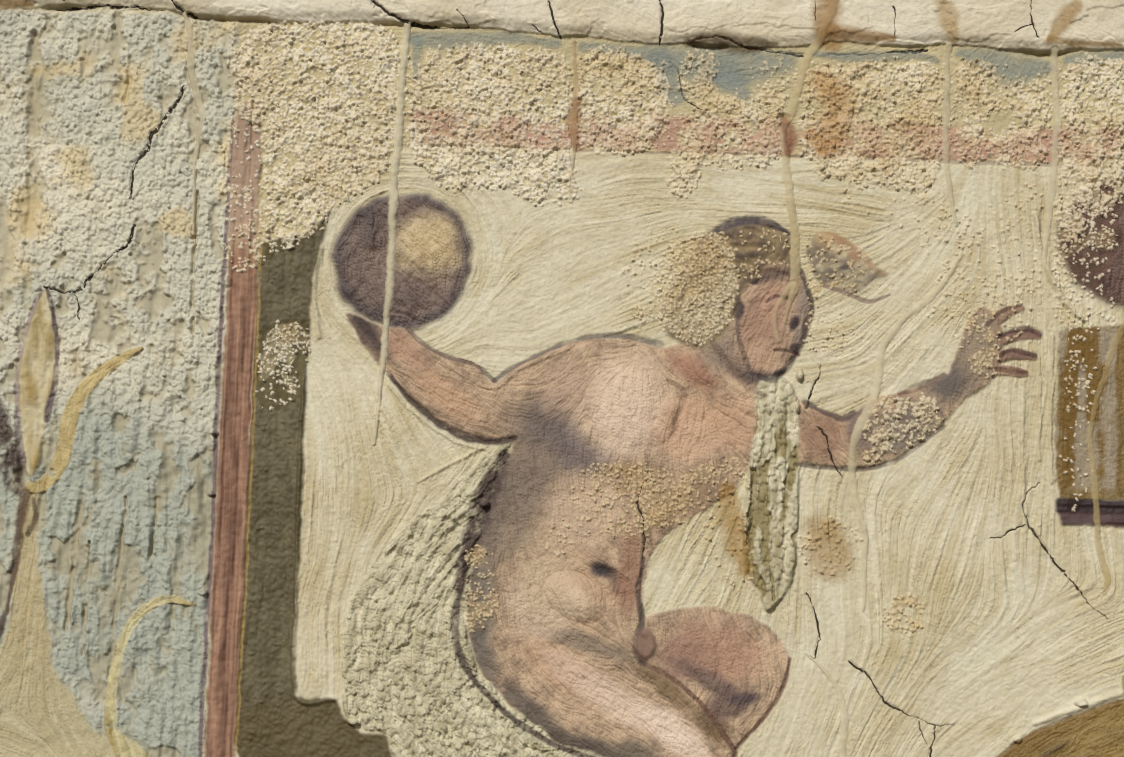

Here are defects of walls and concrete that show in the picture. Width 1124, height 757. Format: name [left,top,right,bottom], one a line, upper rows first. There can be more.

crack [56,0,198,19]
crack [371,0,469,29]
crack [532,1,562,39]
crack [1014,0,1039,37]
crack [43,85,185,320]
crack [990,482,1108,619]
crack [806,592,821,658]
crack [848,661,953,757]